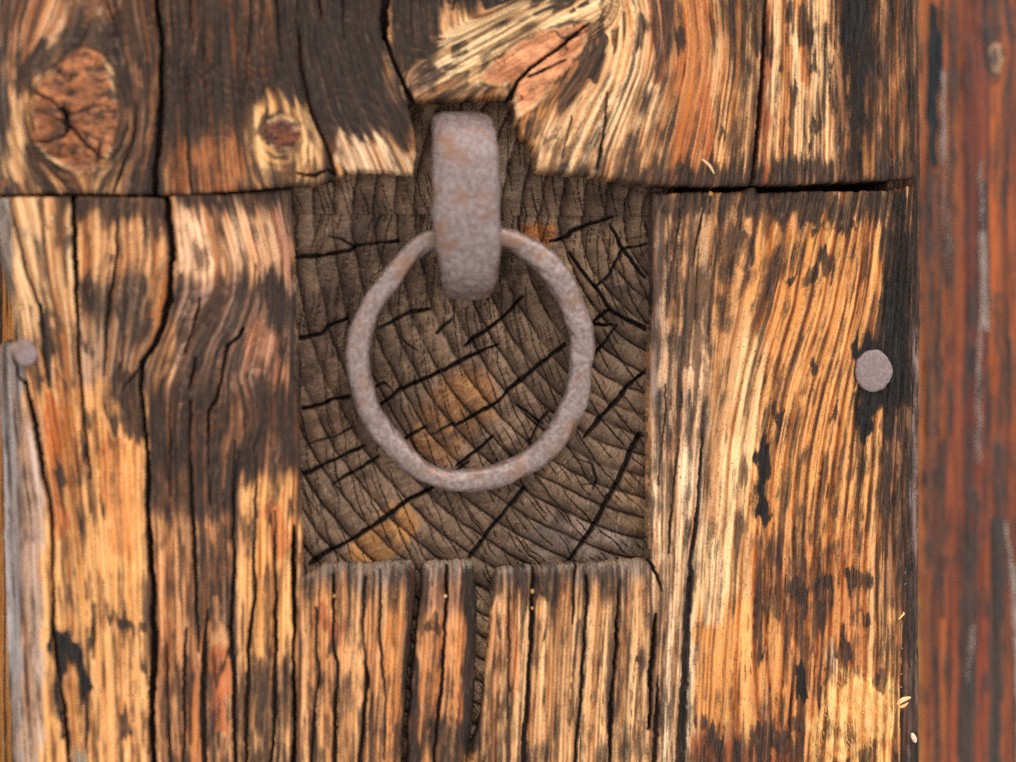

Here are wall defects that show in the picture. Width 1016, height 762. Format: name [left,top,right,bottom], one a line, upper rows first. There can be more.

crack [504,22,591,105]
crack [561,115,573,159]
crack [596,92,608,170]
crack [548,215,648,358]
crack [673,195,706,267]
crack [34,0,526,762]
crack [404,342,567,446]
crack [9,199,71,762]
crack [565,368,706,762]
crack [506,564,536,762]